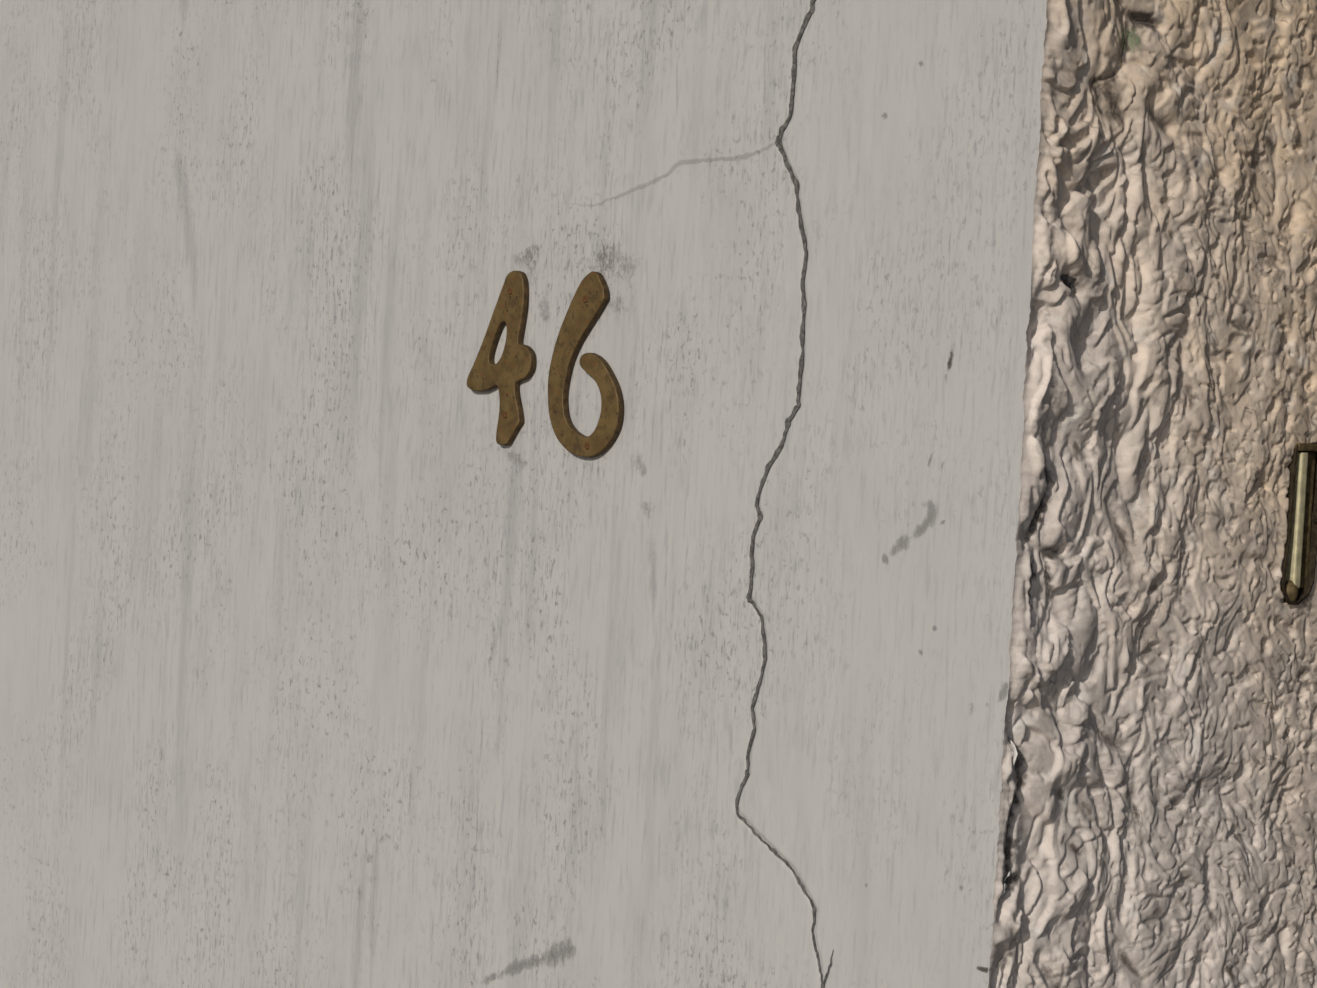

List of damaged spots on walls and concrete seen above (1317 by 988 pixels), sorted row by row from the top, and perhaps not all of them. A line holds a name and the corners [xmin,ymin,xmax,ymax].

crack [735,0,834,988]